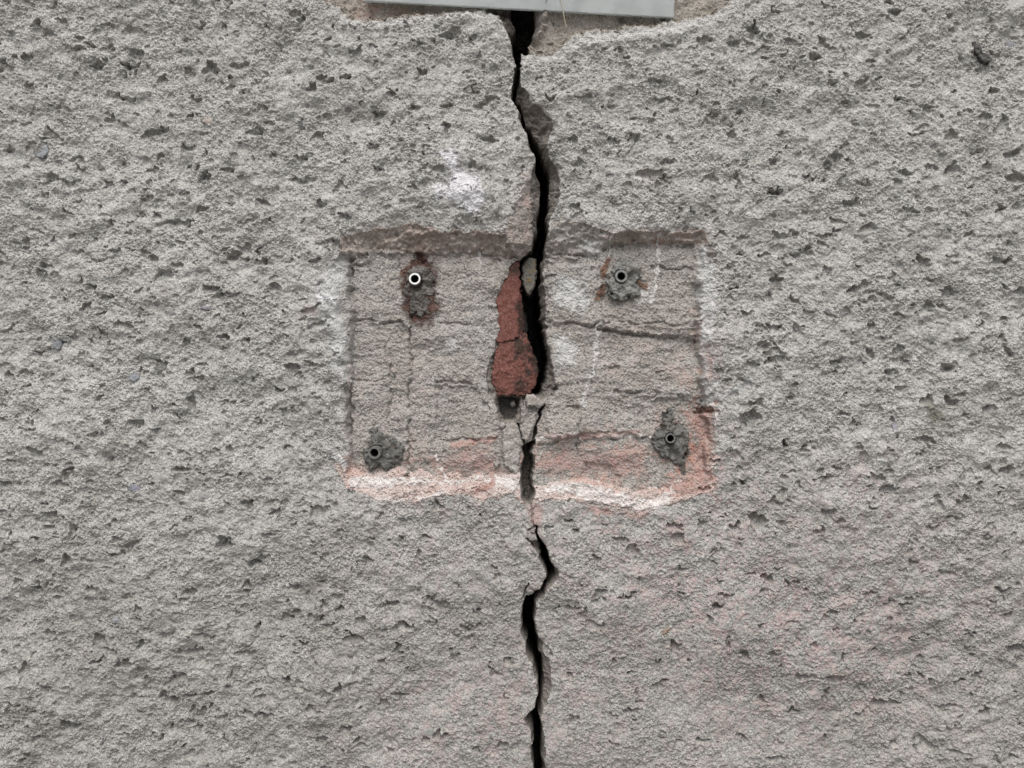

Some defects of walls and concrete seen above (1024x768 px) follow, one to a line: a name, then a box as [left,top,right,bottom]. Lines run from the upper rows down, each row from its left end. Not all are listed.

spalling [329,216,721,511]
crack [343,2,708,768]